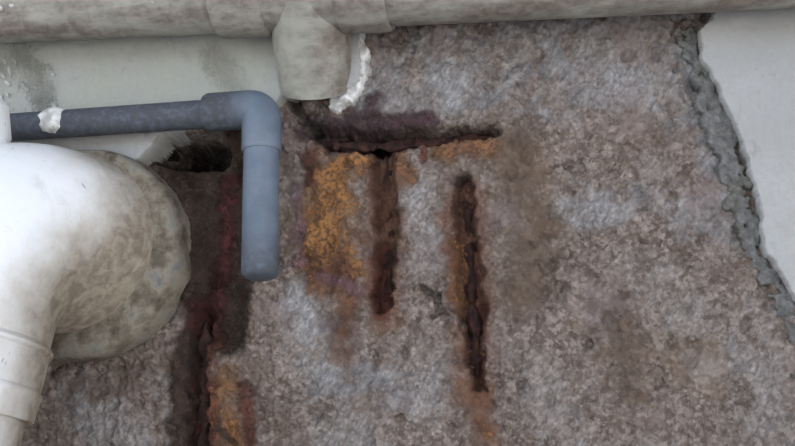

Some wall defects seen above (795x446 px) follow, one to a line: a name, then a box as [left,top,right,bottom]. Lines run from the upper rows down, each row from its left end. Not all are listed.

spalling [20,287,196,446]
spalling [144,129,243,214]
corrosion [150,130,258,446]
corrosion [295,91,503,325]
corrosion [437,179,490,405]
spalling [191,12,795,446]